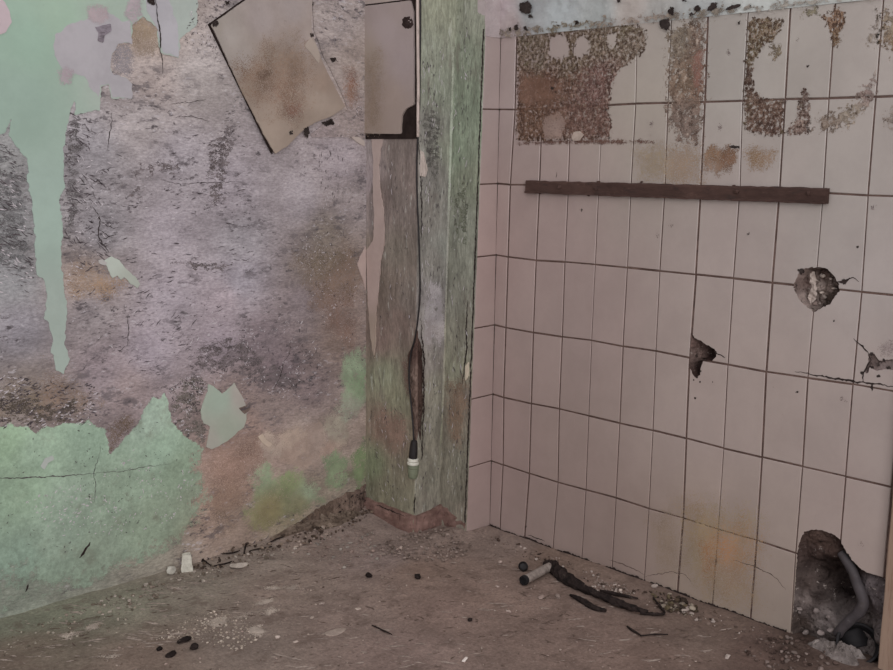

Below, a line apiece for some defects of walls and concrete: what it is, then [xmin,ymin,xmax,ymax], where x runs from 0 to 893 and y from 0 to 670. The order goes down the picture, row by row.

crack [147,0,163,73]
peeling [0,0,198,374]
spalling [793,267,859,312]
spalling [689,333,725,383]
crack [802,372,893,391]
spalling [853,338,893,379]
crack [1,448,157,501]
peeling [0,334,310,614]
spalling [792,530,885,658]